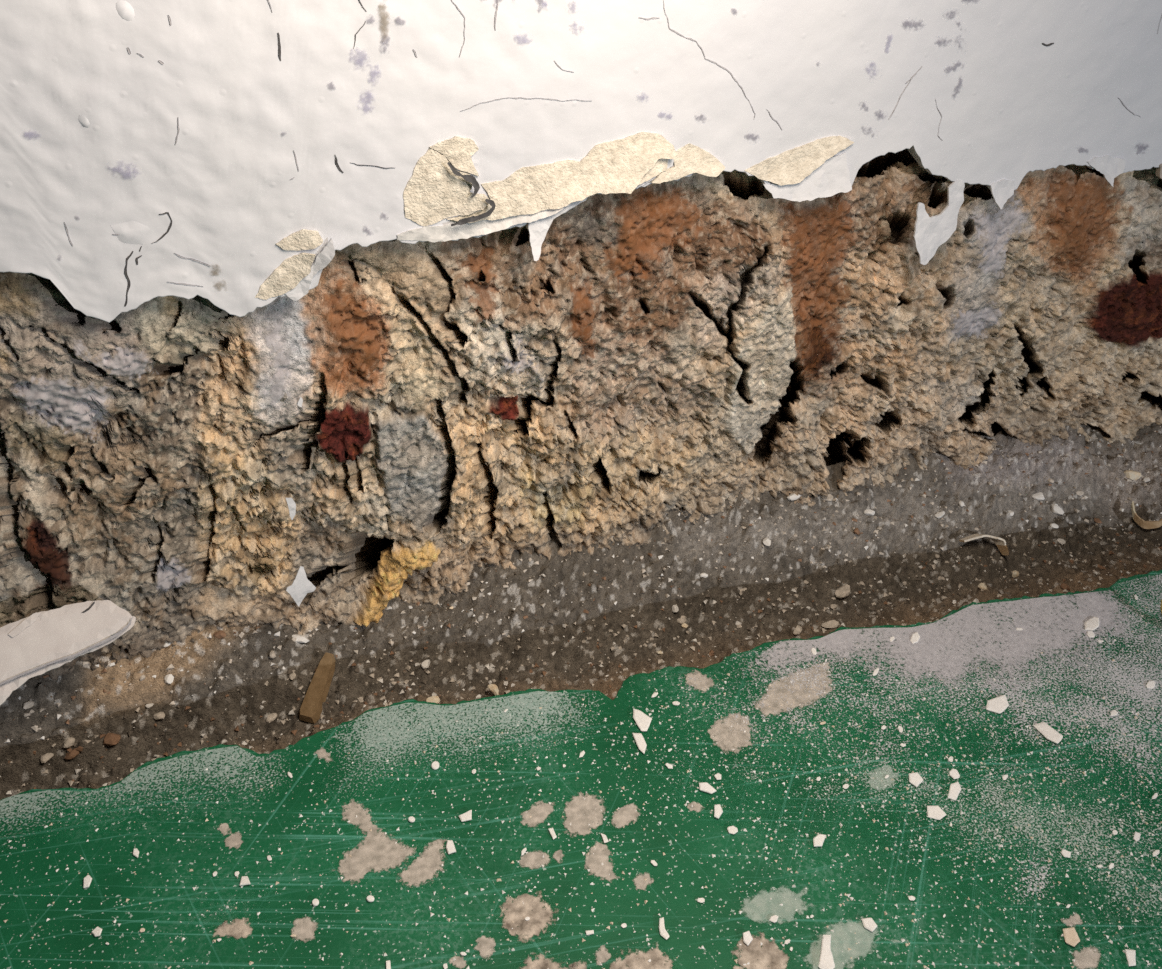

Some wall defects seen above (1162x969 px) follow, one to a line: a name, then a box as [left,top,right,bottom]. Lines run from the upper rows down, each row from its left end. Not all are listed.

crack [335,155,392,173]
crack [112,212,211,307]
flaking render [0,132,1162,680]
flaking render [632,709,652,754]
peeling [708,662,833,753]
flaking render [986,695,1009,714]
peeling [334,799,456,886]
peeling [519,792,640,881]
flaking render [927,782,961,820]
peeling [732,887,807,969]
peeling [805,918,881,969]
peeling [1061,913,1101,969]